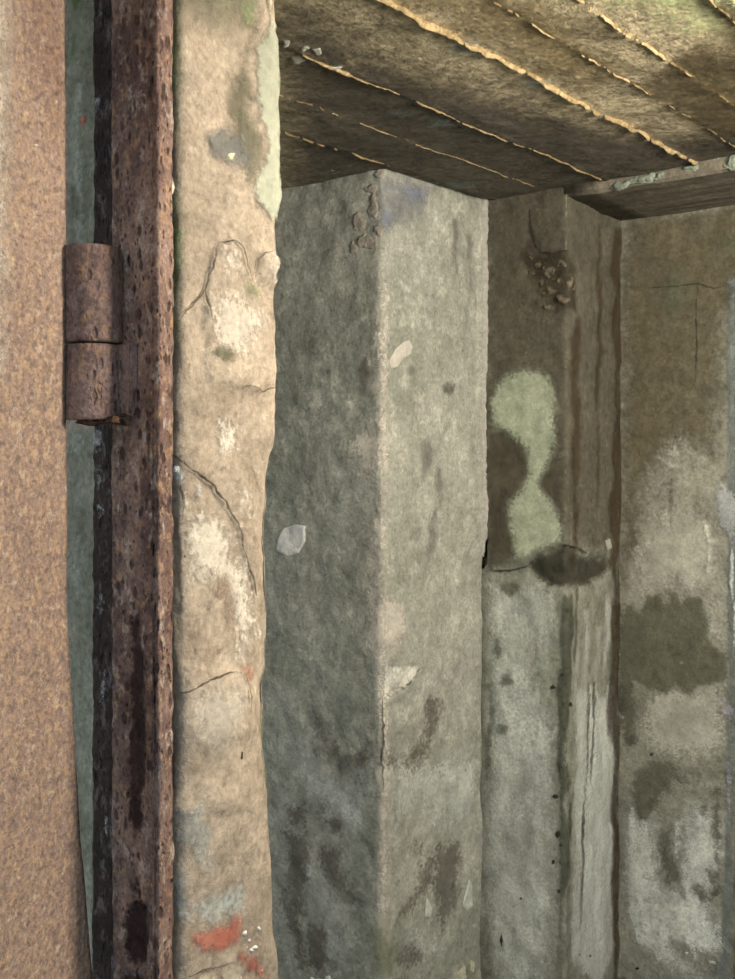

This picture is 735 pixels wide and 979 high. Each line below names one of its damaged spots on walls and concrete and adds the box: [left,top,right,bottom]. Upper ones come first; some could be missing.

crack [175,456,257,596]
crack [182,239,266,317]
damp [276,6,735,979]
peeling [715,279,735,979]